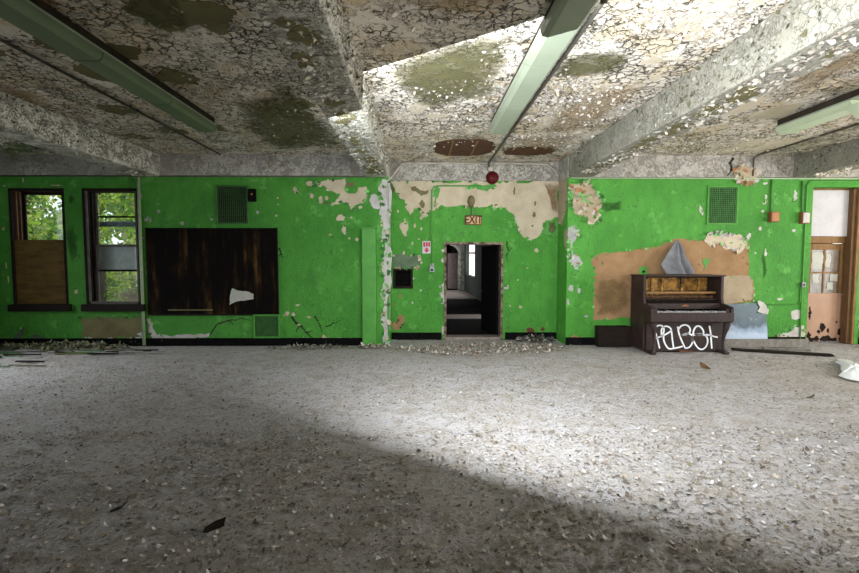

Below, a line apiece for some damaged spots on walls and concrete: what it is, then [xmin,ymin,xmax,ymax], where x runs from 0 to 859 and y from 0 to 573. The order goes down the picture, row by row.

water stain [131,0,186,27]
water stain [397,41,504,108]
water stain [556,54,626,77]
water stain [244,92,339,149]
peeling [0,0,859,345]